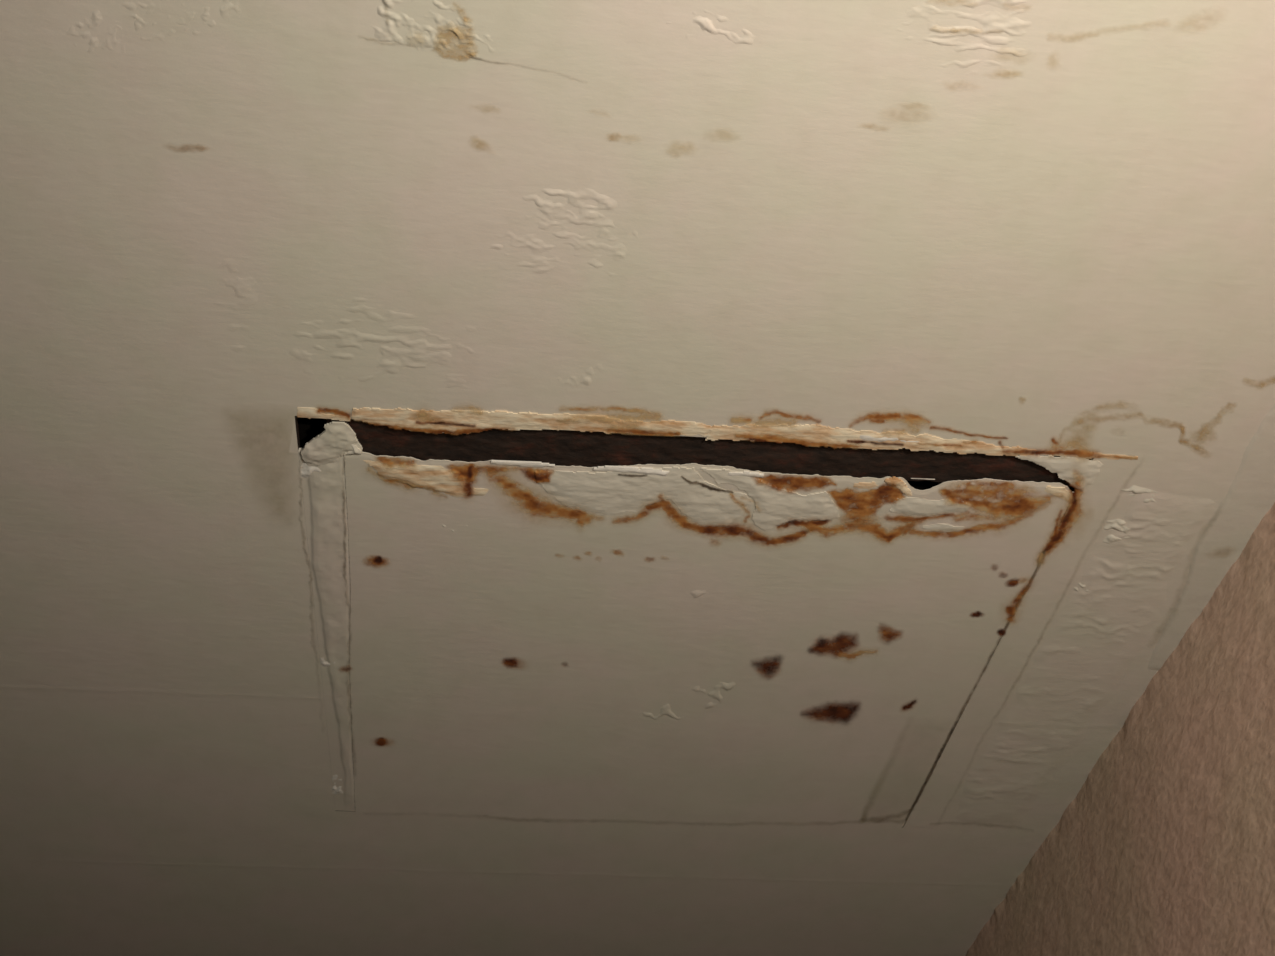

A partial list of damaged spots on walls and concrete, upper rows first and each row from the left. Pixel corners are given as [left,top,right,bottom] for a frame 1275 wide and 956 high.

rust [563,407,680,436]
peeling [297,407,1138,502]
rust [731,411,1136,459]
rust [449,463,594,527]
peeling [491,460,840,531]
rust [614,474,1051,545]
peeling [853,476,971,532]
rust [1039,476,1083,563]
rust [998,580,1027,635]
rust [754,658,779,677]
rust [810,635,875,659]
rust [804,704,858,722]